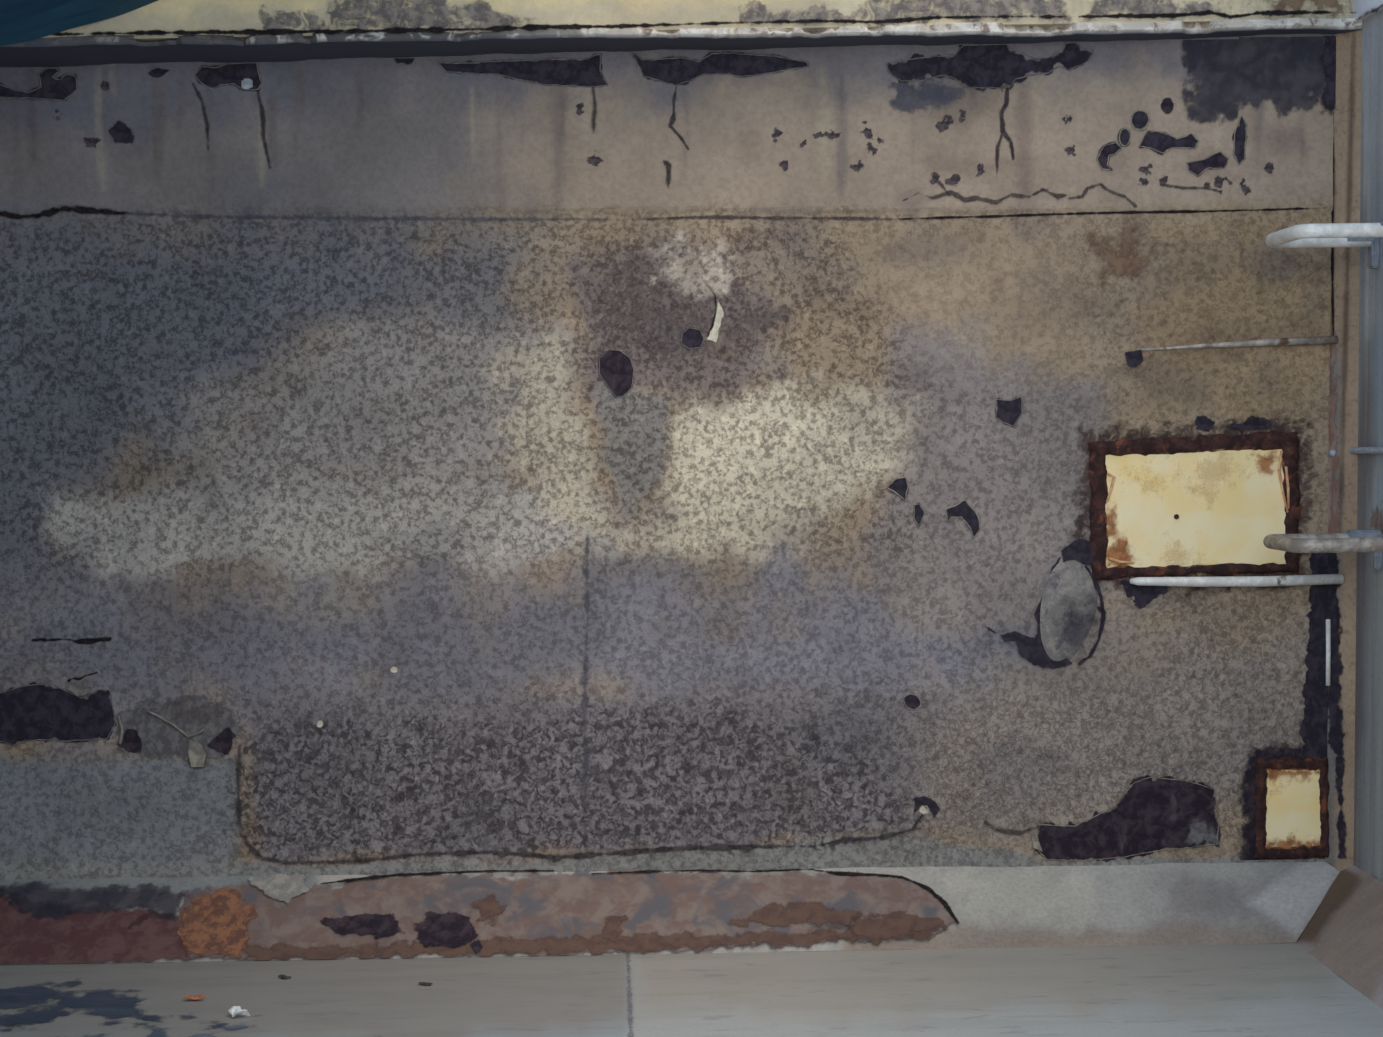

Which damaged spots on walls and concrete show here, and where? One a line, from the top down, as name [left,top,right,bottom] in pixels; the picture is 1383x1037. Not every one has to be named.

peeling [740,0,1071,31]
peeling [1088,0,1219,20]
spalling [850,121,884,172]
spalling [887,42,1094,185]
peeling [1096,98,1251,195]
crack [646,113,1334,335]
corrosion [1073,344,1342,595]
peeling [0,679,116,746]
corrosion [0,697,959,964]
corrosion [984,822,1039,835]
peeling [1031,775,1221,862]
corrosion [1239,746,1325,860]